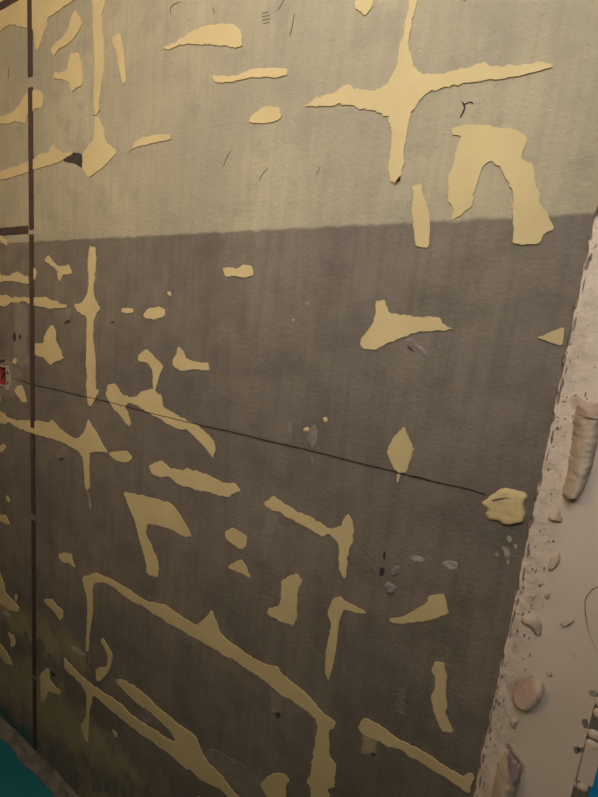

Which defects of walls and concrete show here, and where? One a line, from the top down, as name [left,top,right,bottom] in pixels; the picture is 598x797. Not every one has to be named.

flaking render [0,0,126,180]
flaking render [306,0,552,185]
flaking render [0,246,216,457]
flaking render [360,300,452,357]
flaking render [0,412,132,491]
flaking render [124,492,191,577]
flaking render [149,461,240,498]
crack [11,377,485,494]
flaking render [264,496,354,578]
flaking render [387,427,415,482]
flaking render [482,473,543,533]
flaking render [64,573,336,797]